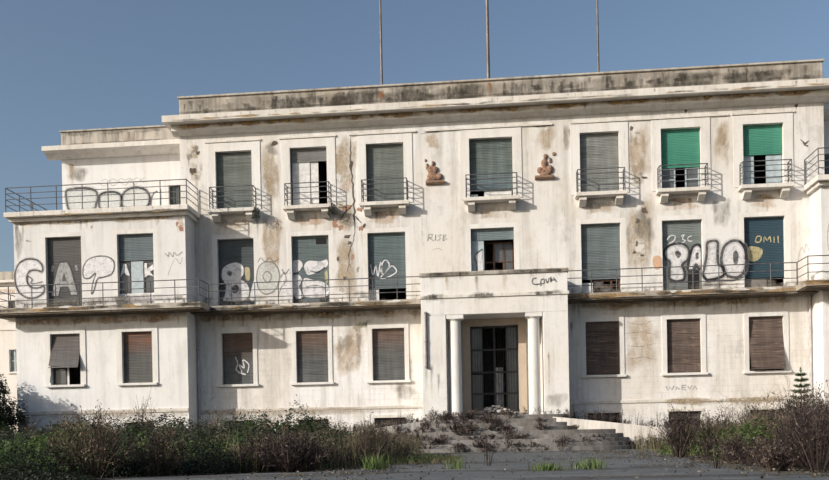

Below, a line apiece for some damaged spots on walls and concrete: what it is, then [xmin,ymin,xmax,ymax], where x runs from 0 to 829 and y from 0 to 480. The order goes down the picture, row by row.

leakage [180,97,315,129]
leakage [331,89,377,106]
leakage [387,84,486,114]
leakage [549,80,587,108]
leakage [606,78,646,104]
crack [339,137,361,270]
peeling [332,204,366,285]